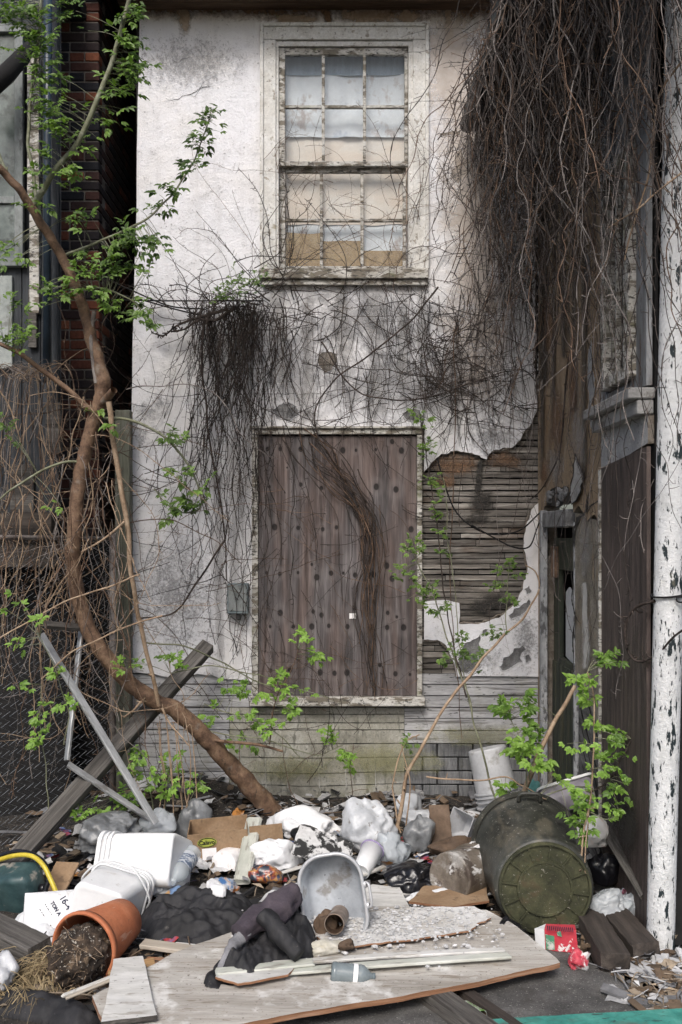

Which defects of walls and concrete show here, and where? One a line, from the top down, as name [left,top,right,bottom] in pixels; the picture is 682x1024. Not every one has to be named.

flaking render [317,351,338,373]
flaking render [272,403,300,422]
flaking render [402,408,584,676]